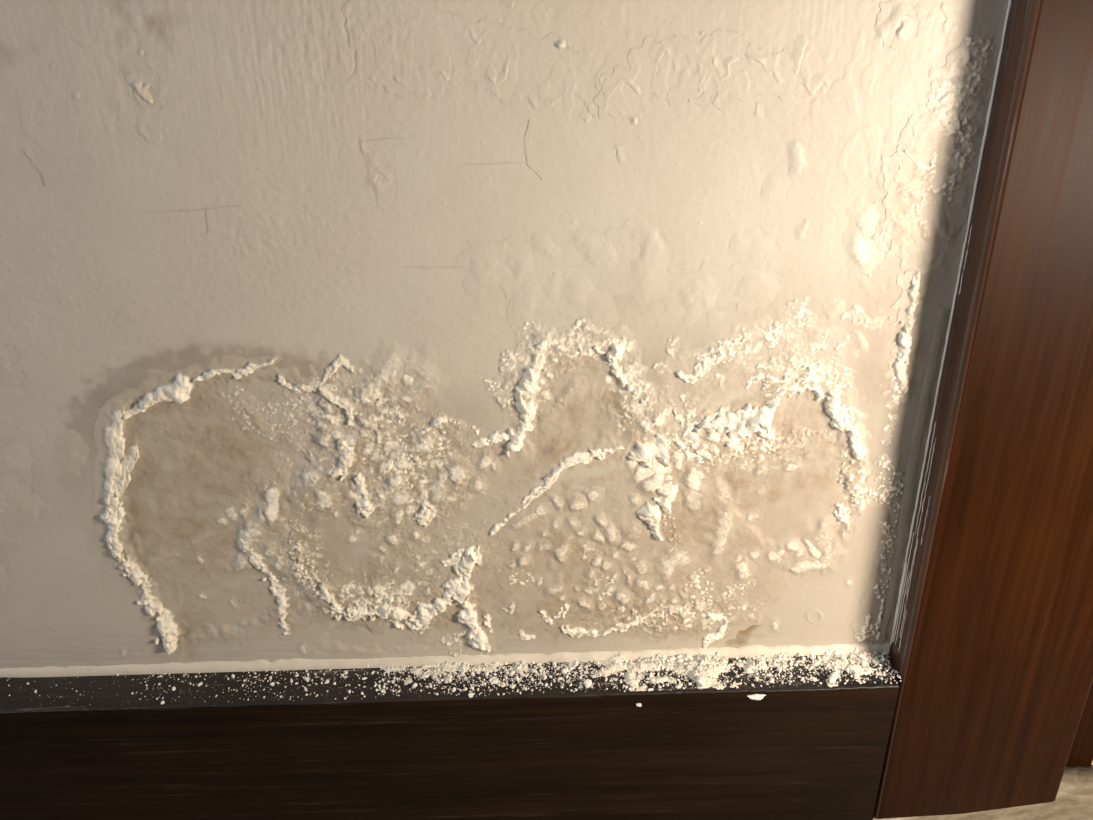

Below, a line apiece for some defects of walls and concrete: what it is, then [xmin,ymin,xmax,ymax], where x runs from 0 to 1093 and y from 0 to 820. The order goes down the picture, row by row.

peeling [91,296,886,663]
efflorescence [843,33,996,644]